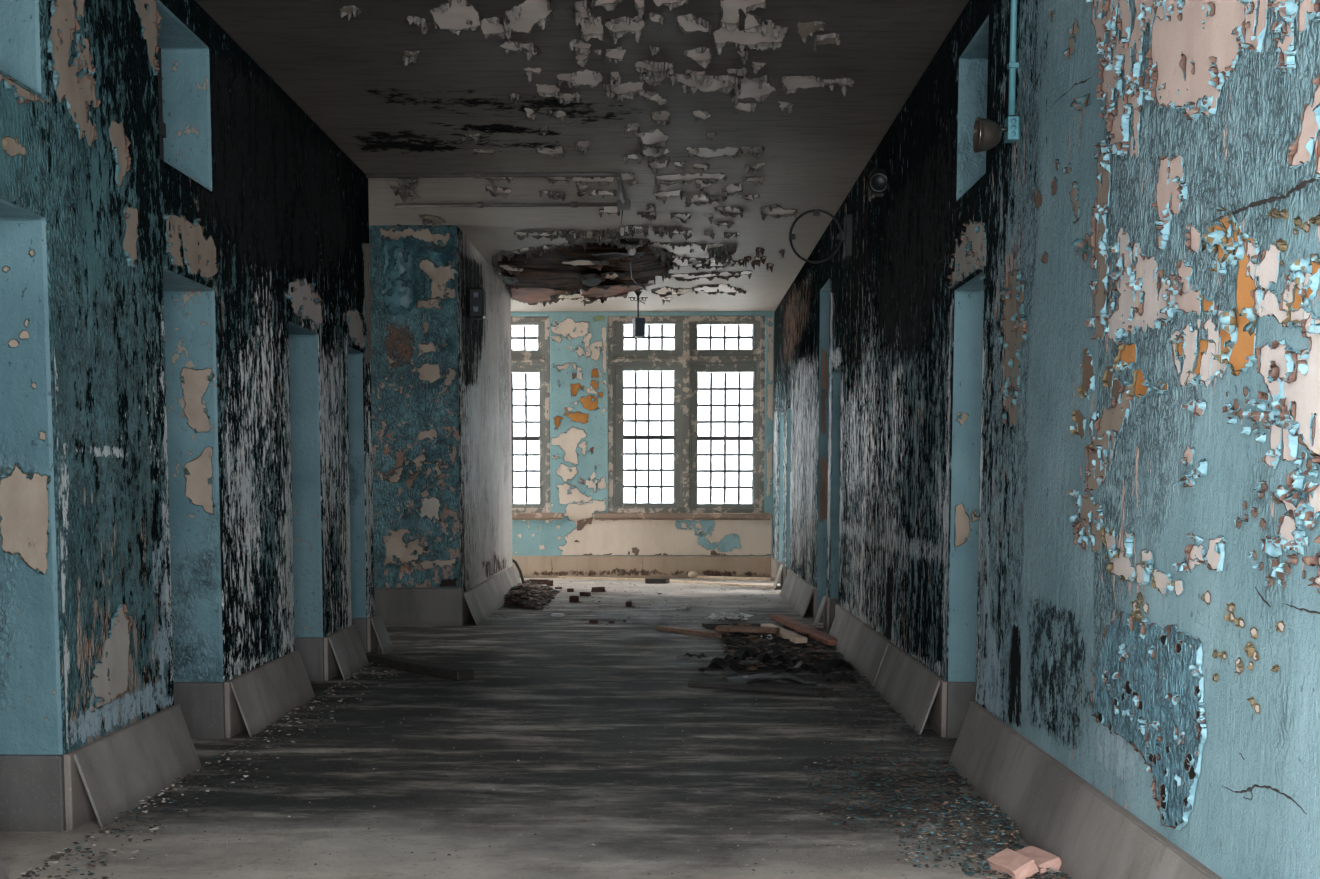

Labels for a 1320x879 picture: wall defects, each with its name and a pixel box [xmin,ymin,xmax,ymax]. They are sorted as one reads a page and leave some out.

peeling [339,5,362,21]
peeling [406,0,855,305]
peeling [0,462,51,575]
damp [57,354,174,749]
damp [226,652,270,677]
damp [222,339,294,644]
peeling [382,428,456,573]
peeling [517,290,772,556]
damp [780,266,952,676]
peeling [1033,0,1320,830]
crack [1226,753,1305,813]